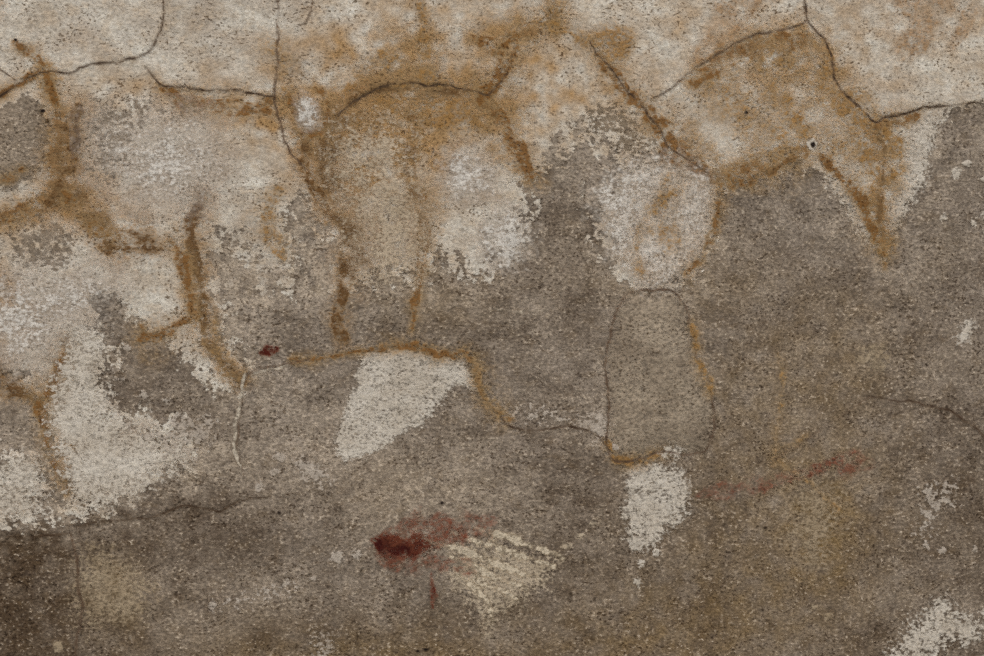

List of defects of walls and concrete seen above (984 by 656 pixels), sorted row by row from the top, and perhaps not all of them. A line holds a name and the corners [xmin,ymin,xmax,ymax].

crack [0,0,302,165]
crack [338,68,509,115]
crack [590,0,979,168]
leakage [259,345,279,356]
crack [502,419,610,450]
crack [858,396,984,437]
crack [40,358,310,656]